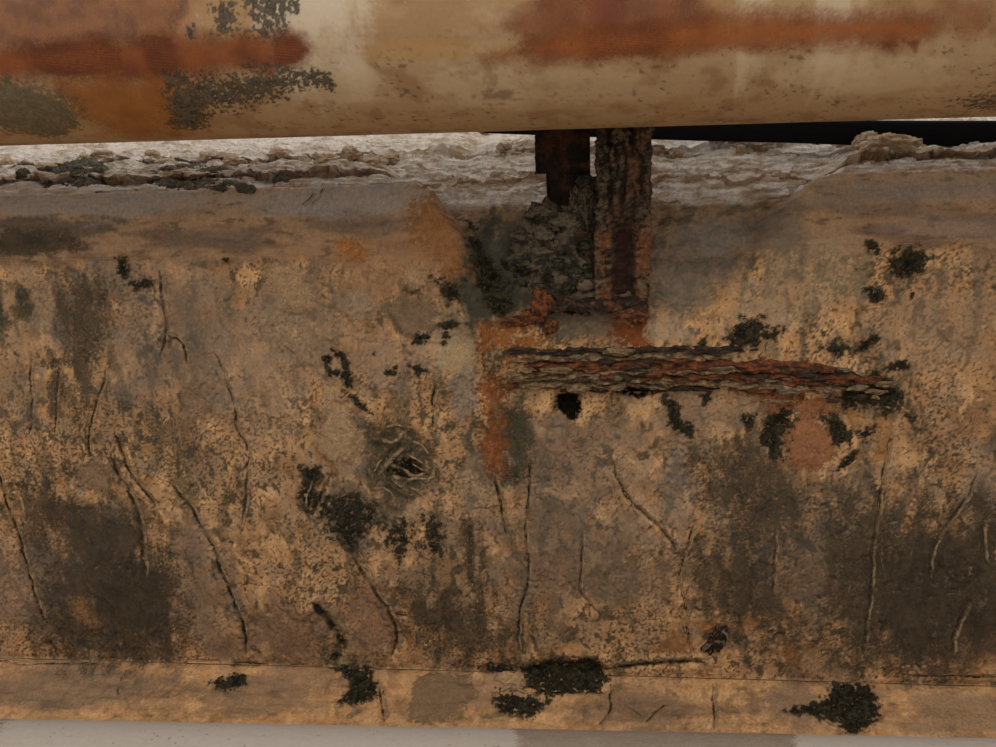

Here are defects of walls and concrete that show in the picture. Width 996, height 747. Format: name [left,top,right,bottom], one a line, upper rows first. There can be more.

crack [0,469,49,621]
damp [3,470,194,675]
crack [88,358,264,666]
crack [313,603,356,668]
crack [494,462,534,650]
spalling [554,393,582,421]
spalling [615,387,657,400]
crack [600,463,701,724]
corrosion [474,286,898,486]
damp [681,429,808,648]
peeling [759,392,860,472]
damp [819,472,996,687]